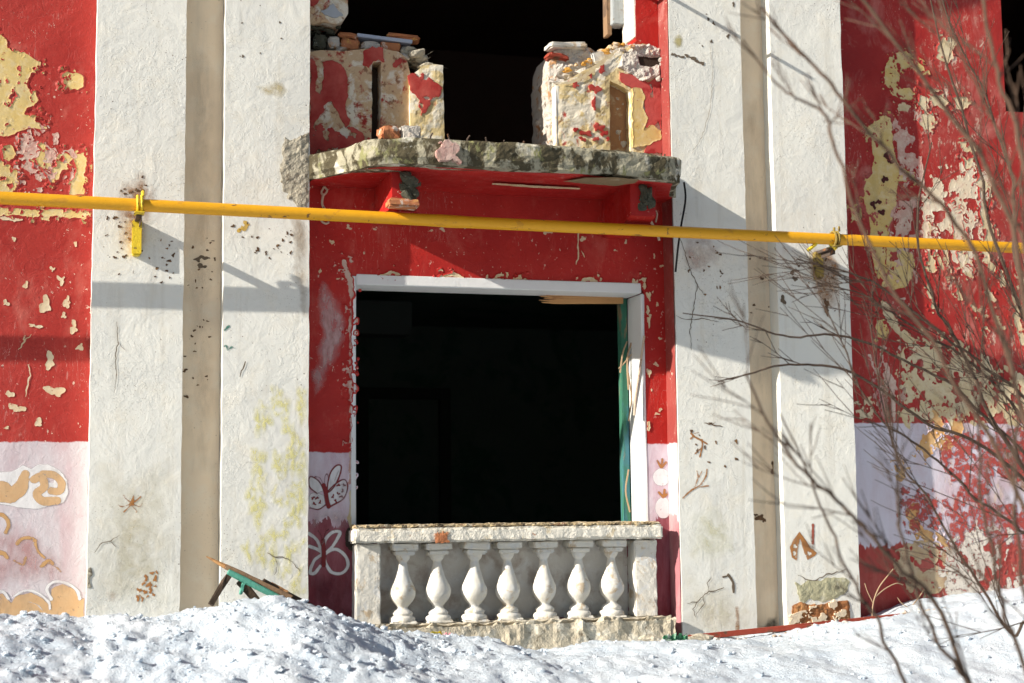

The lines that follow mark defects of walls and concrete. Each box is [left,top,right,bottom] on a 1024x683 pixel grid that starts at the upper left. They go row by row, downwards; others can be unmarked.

peeling [0,28,93,196]
peeling [280,4,448,208]
spalling [544,42,662,154]
peeling [0,205,92,227]
spalling [23,266,83,350]
crack [676,239,745,350]
peeling [846,32,1024,484]
spalling [5,390,26,412]
spalling [43,386,66,397]
peeling [318,240,365,551]
peeling [893,483,1024,598]
spalling [788,577,850,625]